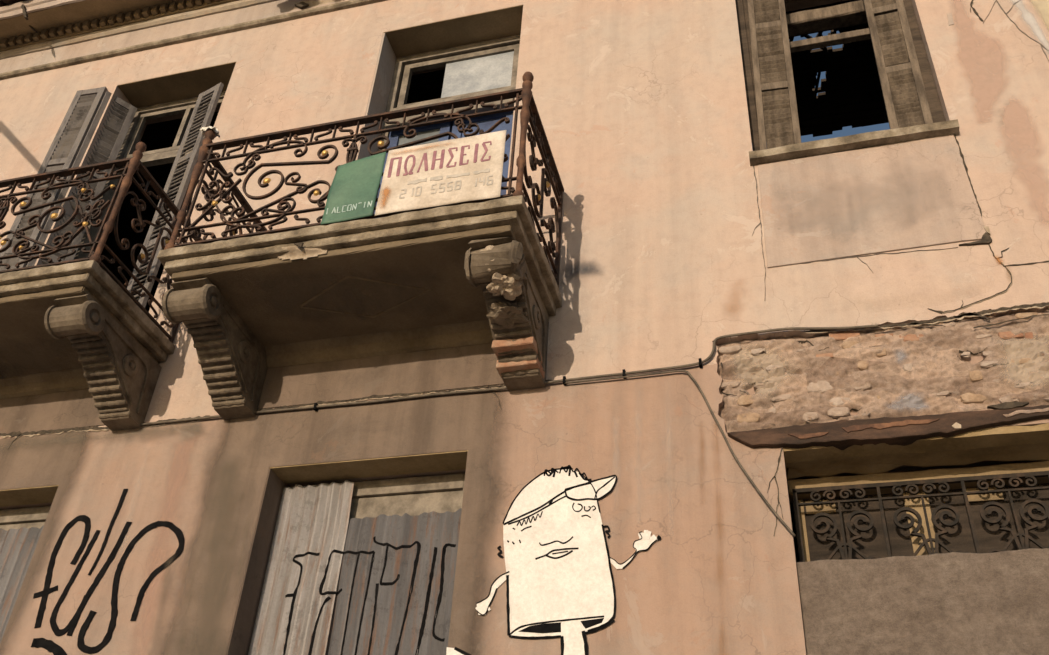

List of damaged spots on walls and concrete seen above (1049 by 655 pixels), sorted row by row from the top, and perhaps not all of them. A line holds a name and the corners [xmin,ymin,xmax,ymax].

crack [970,0,1049,61]
spalling [464,245,545,380]
crack [752,165,766,291]
spalling [717,308,1049,433]
crack [800,244,1049,334]
crack [954,134,982,216]